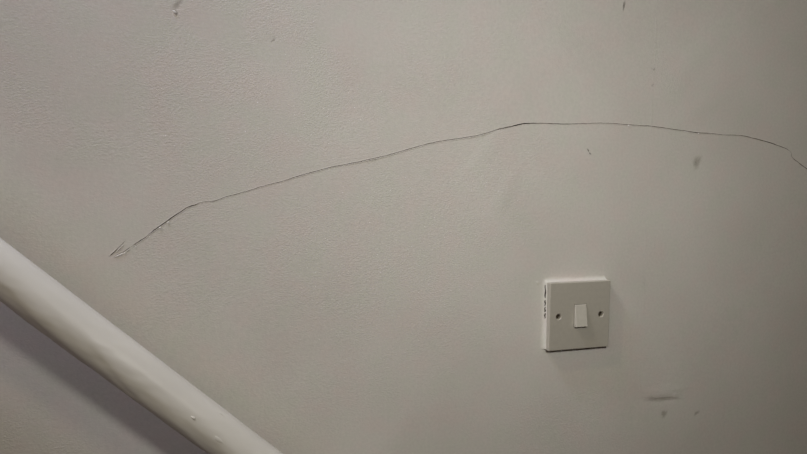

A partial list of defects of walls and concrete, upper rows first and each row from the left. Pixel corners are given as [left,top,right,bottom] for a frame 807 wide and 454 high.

crack [110,122,807,258]